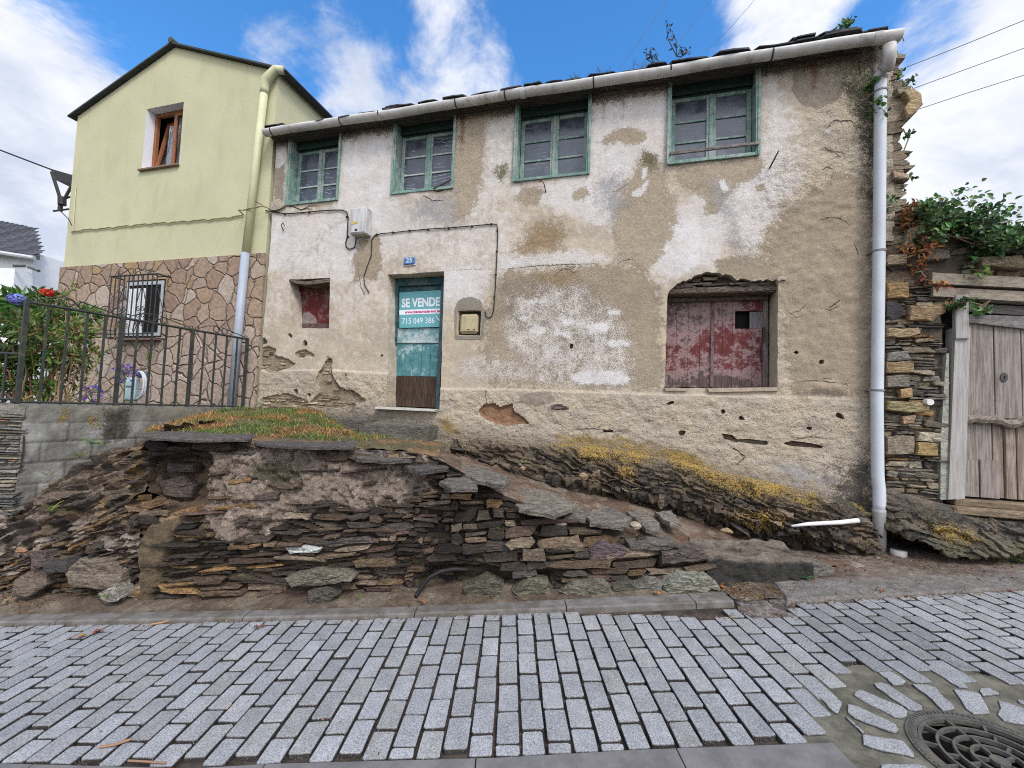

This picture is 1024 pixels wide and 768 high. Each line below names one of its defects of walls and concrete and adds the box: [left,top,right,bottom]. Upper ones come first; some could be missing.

spalling [260,339,314,373]
spalling [260,358,366,410]
water stain [482,214,635,379]
peeling [450,114,769,426]
peeling [715,166,873,408]